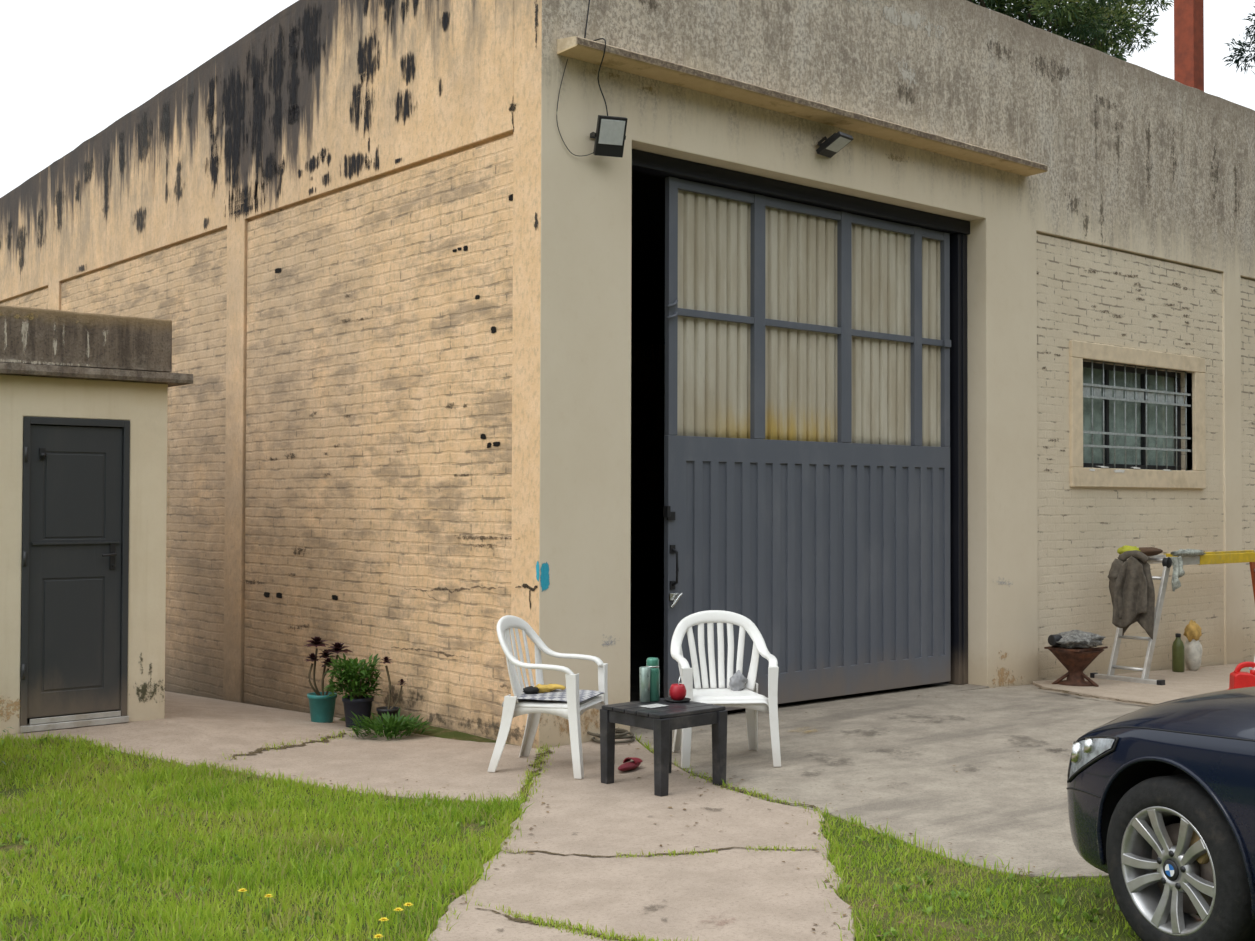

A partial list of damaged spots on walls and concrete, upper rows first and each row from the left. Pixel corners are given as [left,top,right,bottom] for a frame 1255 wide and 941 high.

leakage [0,101,185,274]
leakage [186,4,329,219]
leakage [340,0,418,179]
leakage [439,12,450,31]
leakage [1026,51,1084,82]
leakage [1064,189,1104,239]